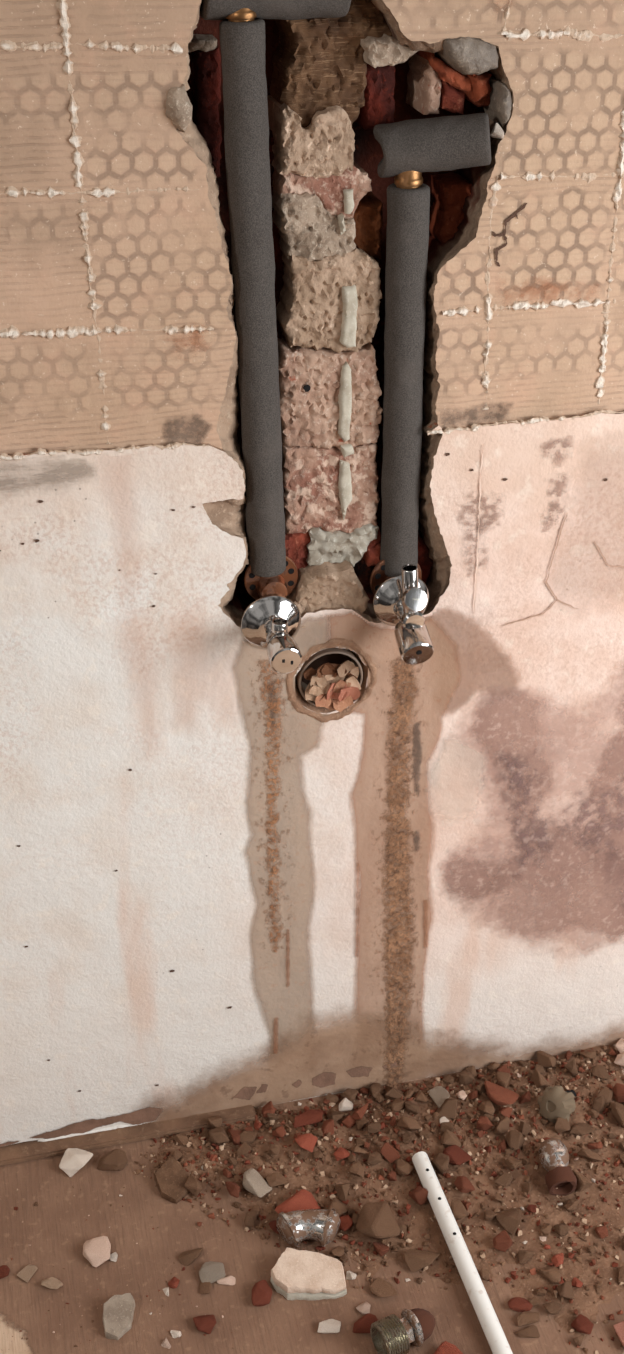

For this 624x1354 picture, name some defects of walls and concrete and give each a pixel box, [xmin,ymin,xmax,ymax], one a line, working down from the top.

spalling [176,4,256,628]
corrosion [255,661,290,986]
leakage [0,613,624,1354]
spalling [267,0,514,628]
corrosion [379,659,428,1085]
crack [503,514,578,626]